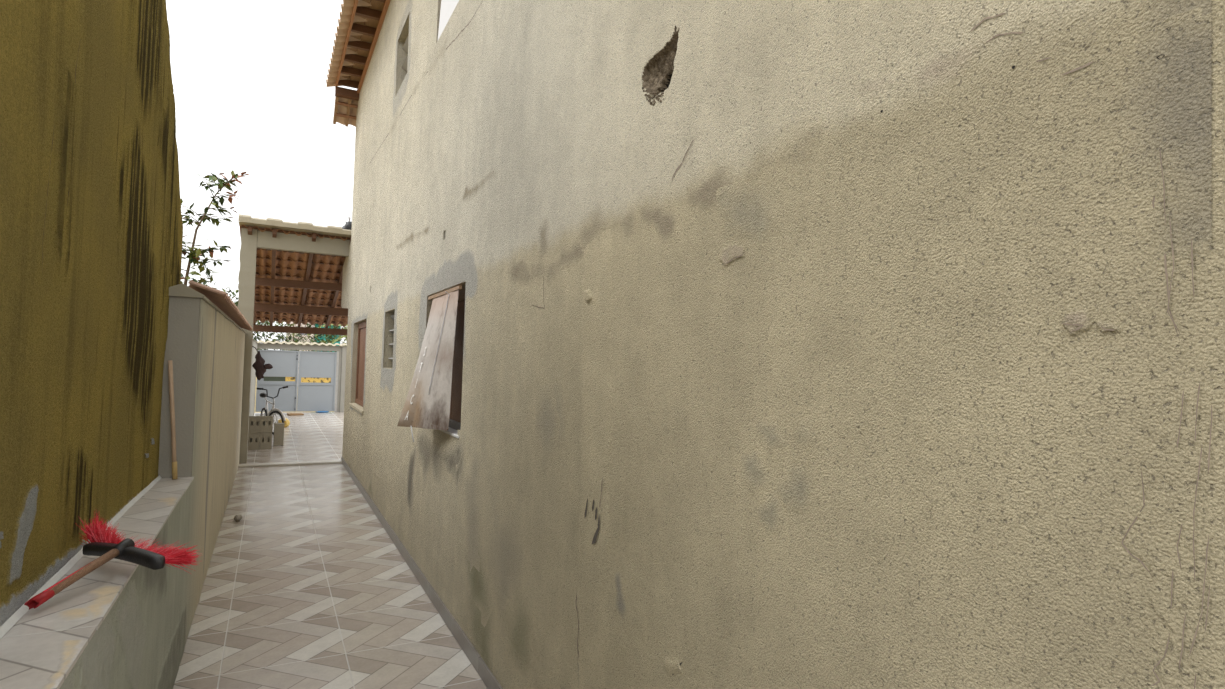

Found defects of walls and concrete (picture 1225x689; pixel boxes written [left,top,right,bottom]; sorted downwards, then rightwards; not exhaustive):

spalling [631,0,690,132]
damp [500,120,827,288]
peeling [6,482,39,587]